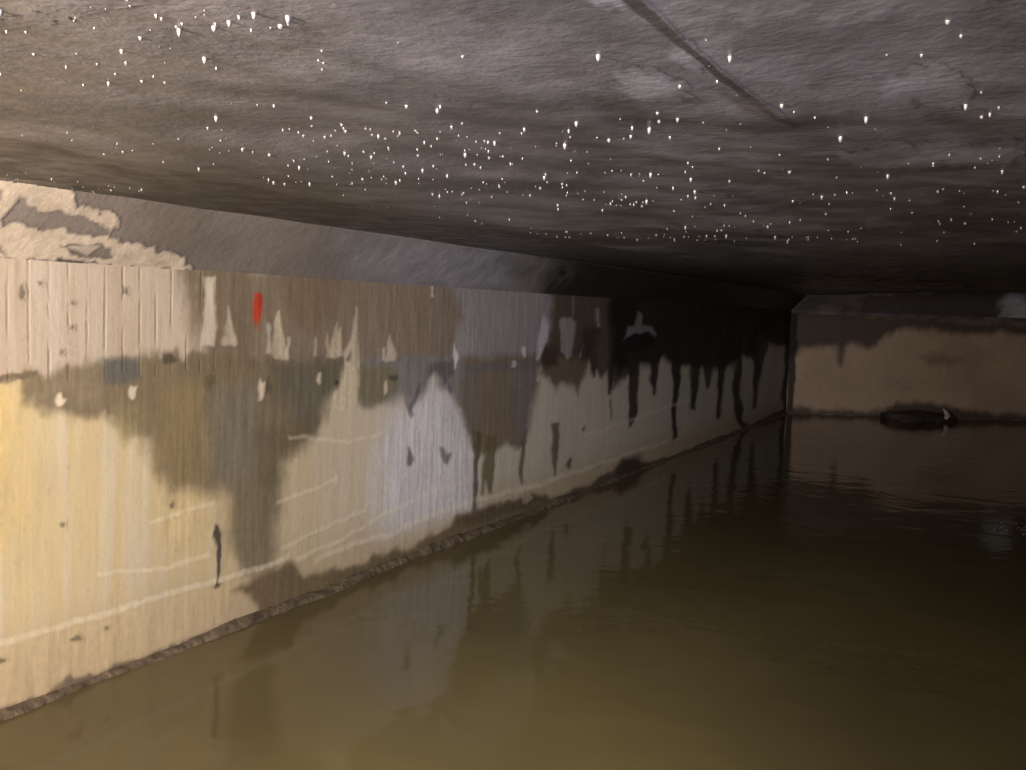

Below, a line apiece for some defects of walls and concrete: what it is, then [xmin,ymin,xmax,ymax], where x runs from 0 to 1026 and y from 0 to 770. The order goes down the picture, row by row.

peeling [0,180,194,270]
damp [0,227,1026,709]